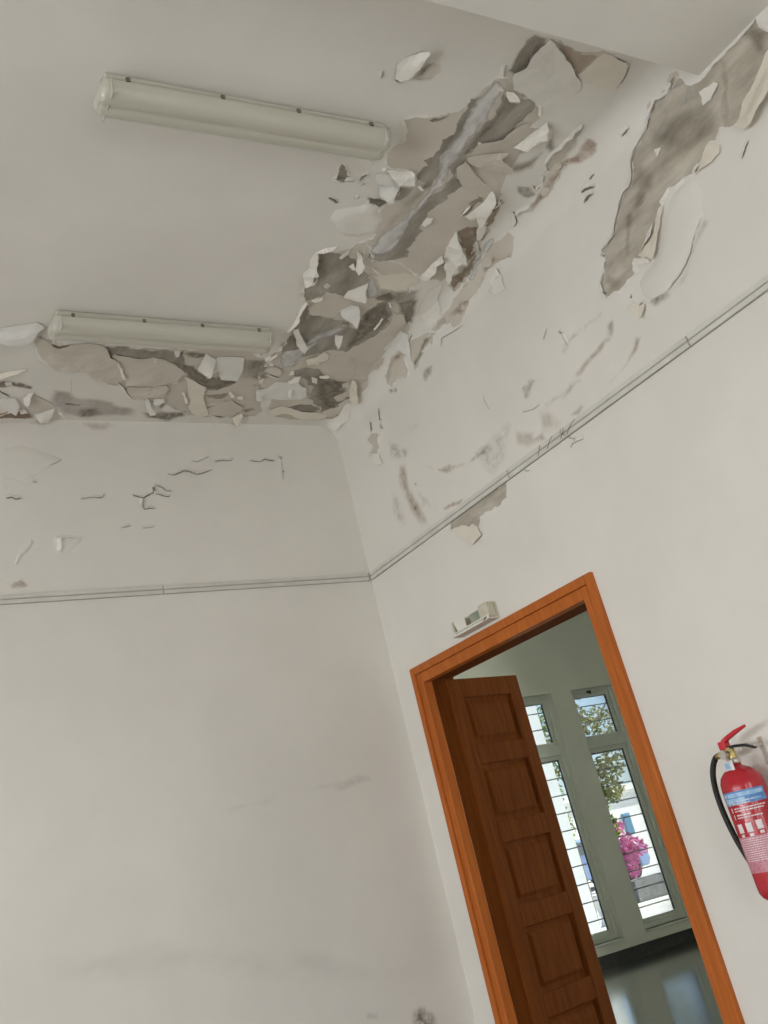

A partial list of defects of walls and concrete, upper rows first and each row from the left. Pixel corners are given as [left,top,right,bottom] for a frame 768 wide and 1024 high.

peeling [598,15,768,300]
peeling [0,37,629,426]
crack [5,477,22,500]
crack [120,454,285,528]
peeling [450,482,509,545]